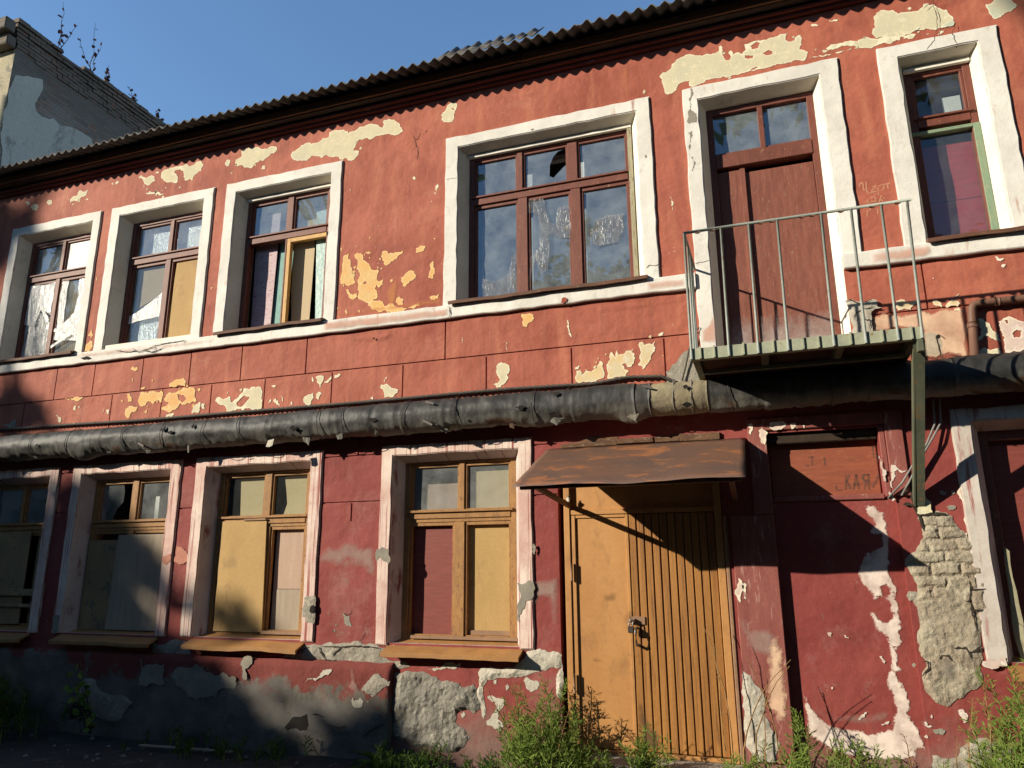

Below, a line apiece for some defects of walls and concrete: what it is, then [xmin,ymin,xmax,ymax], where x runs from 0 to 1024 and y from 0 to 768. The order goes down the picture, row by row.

peeling [660,3,954,171]
peeling [291,119,403,161]
peeling [340,246,439,314]
flaking render [567,324,709,390]
peeling [978,316,1024,354]
peeling [121,367,341,420]
flaking render [905,488,986,723]
flaking render [69,678,133,722]
peeling [139,639,252,701]
flaking render [281,613,562,753]
flaking render [741,671,779,762]